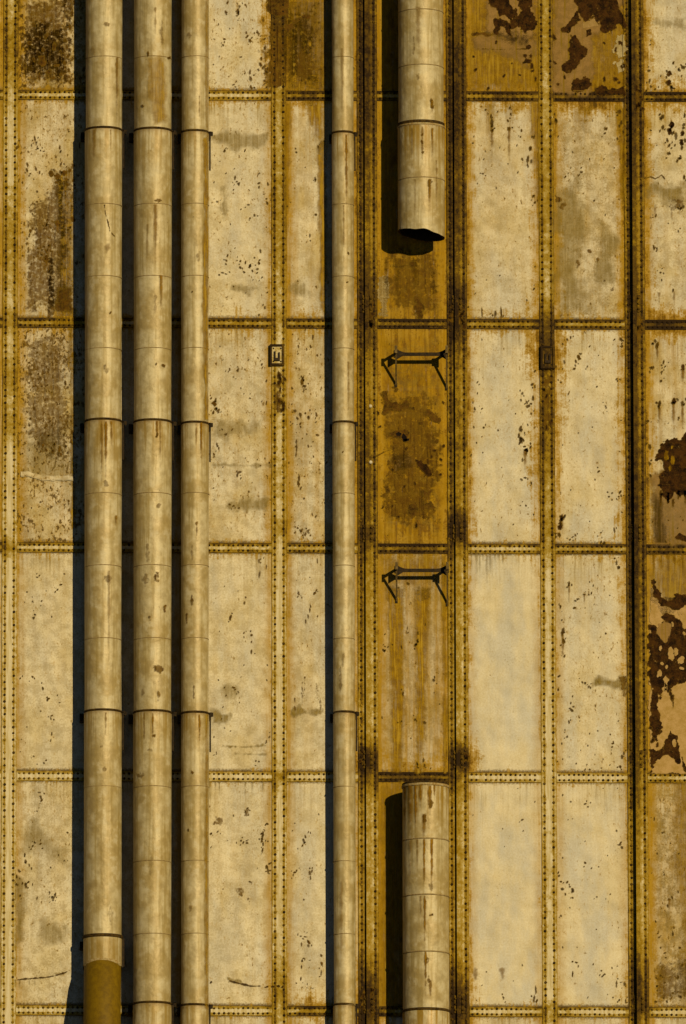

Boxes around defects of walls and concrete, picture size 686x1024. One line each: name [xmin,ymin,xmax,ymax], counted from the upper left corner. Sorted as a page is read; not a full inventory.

corrosion [17,0,74,87]
peeling [468,0,538,90]
peeling [551,0,628,97]
corrosion [244,0,327,314]
corrosion [21,145,76,528]
peeling [650,432,686,546]
peeling [647,558,686,774]